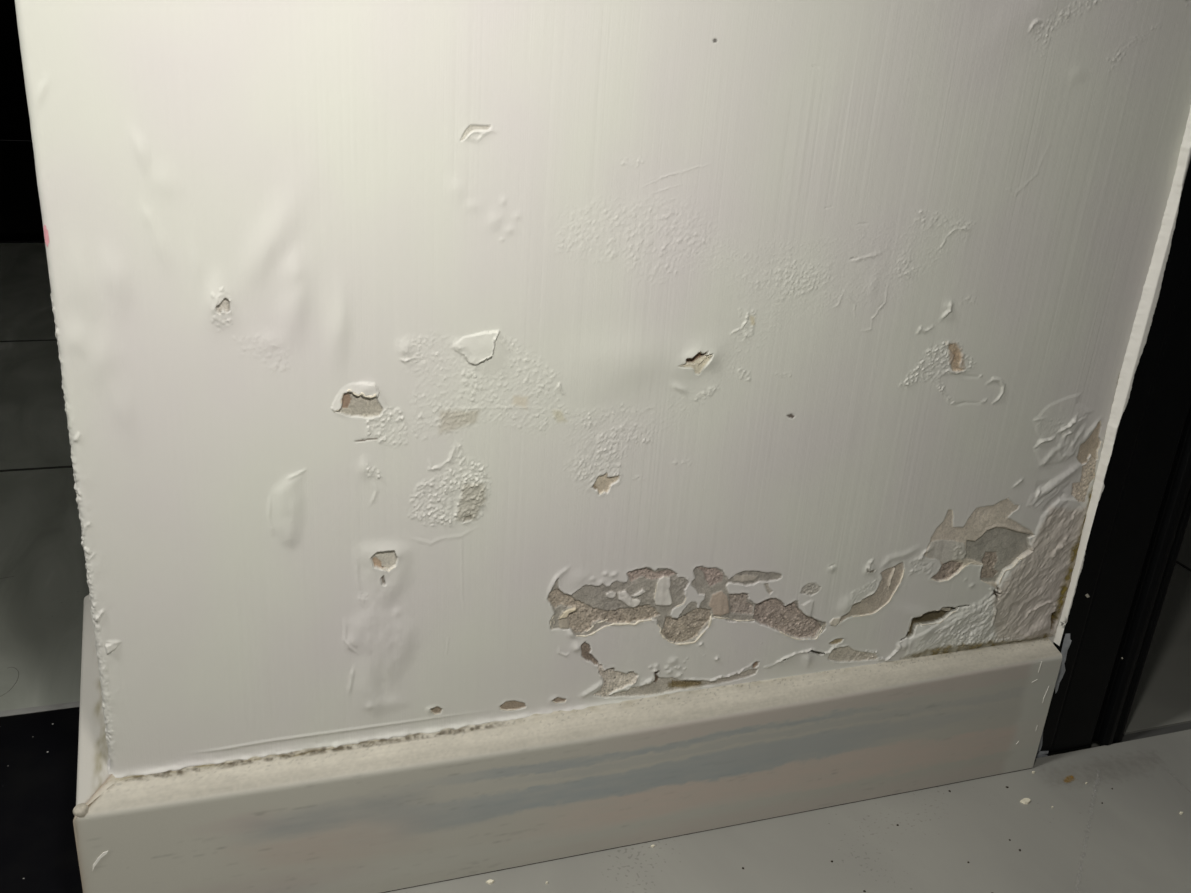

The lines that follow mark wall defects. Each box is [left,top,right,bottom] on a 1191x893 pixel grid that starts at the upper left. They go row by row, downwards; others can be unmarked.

peeling [457,119,500,145]
peeling [457,328,502,363]
peeling [680,345,721,373]
peeling [331,377,410,449]
peeling [924,495,1035,590]
peeling [545,559,908,658]